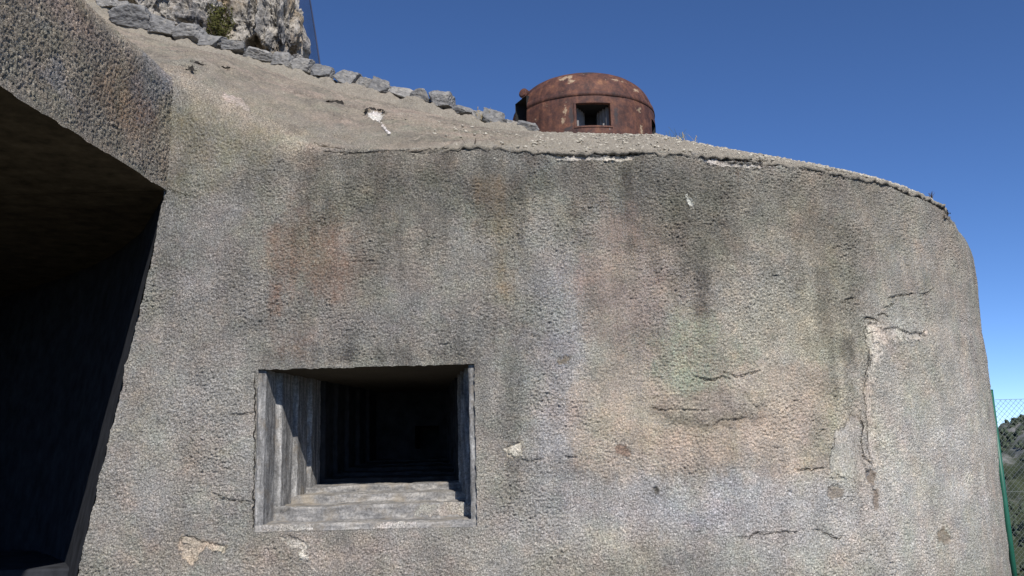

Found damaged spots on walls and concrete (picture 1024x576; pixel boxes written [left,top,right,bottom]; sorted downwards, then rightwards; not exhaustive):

spalling [367,111,391,134]
crack [326,146,466,154]
crack [842,289,934,381]
flaking render [861,321,927,509]
spalling [178,533,228,565]